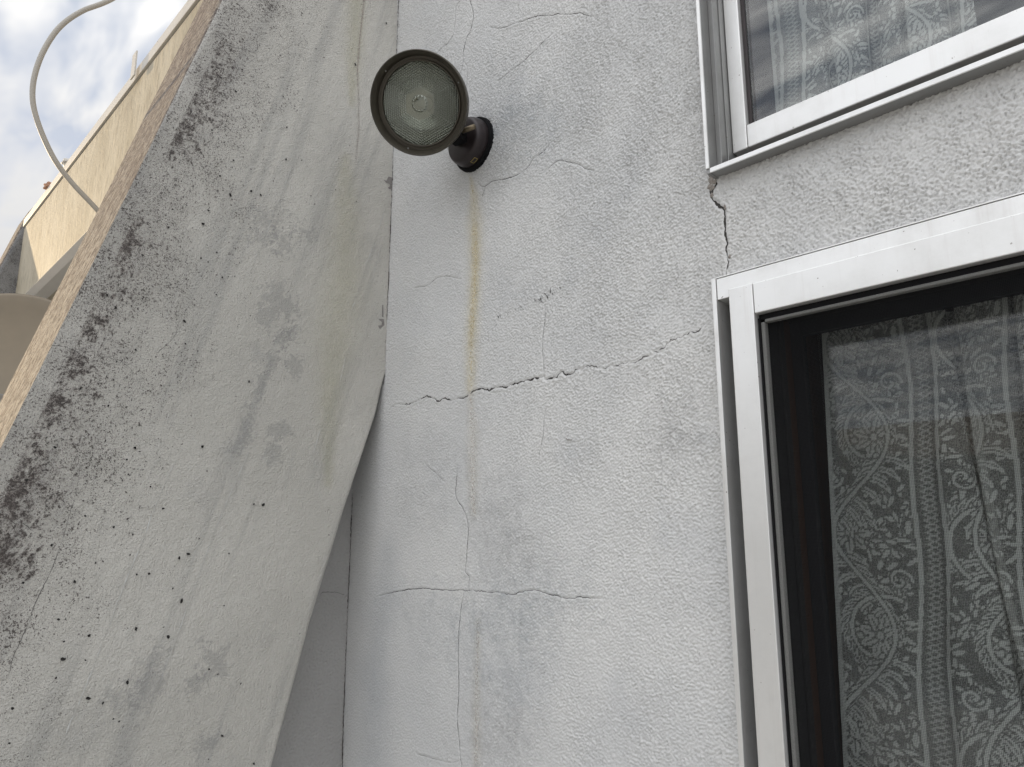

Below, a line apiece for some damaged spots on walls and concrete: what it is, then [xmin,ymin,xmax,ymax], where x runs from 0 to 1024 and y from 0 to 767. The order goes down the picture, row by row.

mould [166,37,242,179]
crack [709,182,729,272]
mould [0,211,156,580]
crack [396,321,709,405]
crack [387,462,601,638]